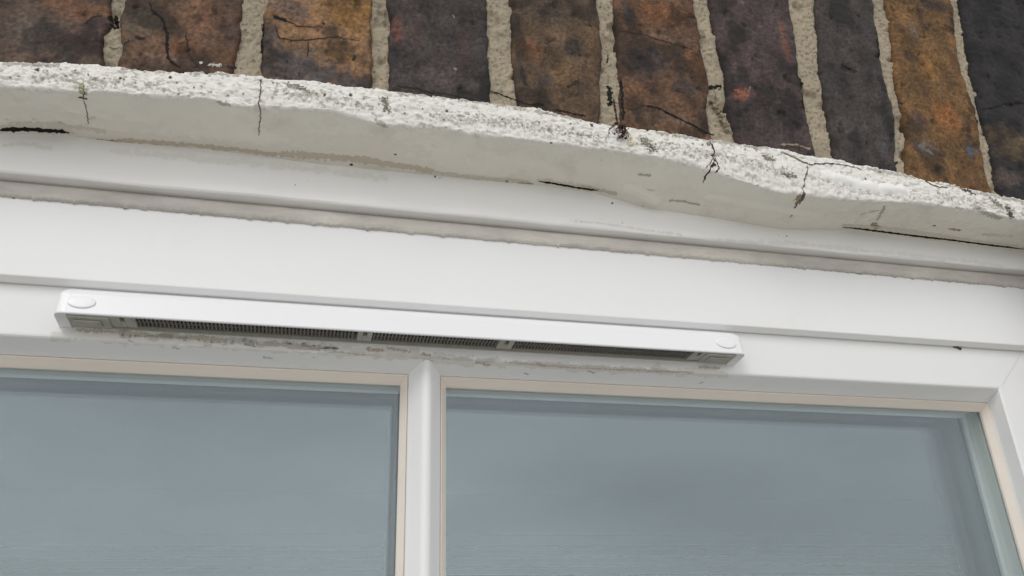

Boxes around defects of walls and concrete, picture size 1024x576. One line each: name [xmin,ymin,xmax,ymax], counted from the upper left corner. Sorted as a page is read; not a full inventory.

crack [149,2,200,69]
crack [0,86,89,134]
crack [258,21,360,135]
crack [619,79,720,183]
crack [539,181,598,191]
crack [784,153,861,218]